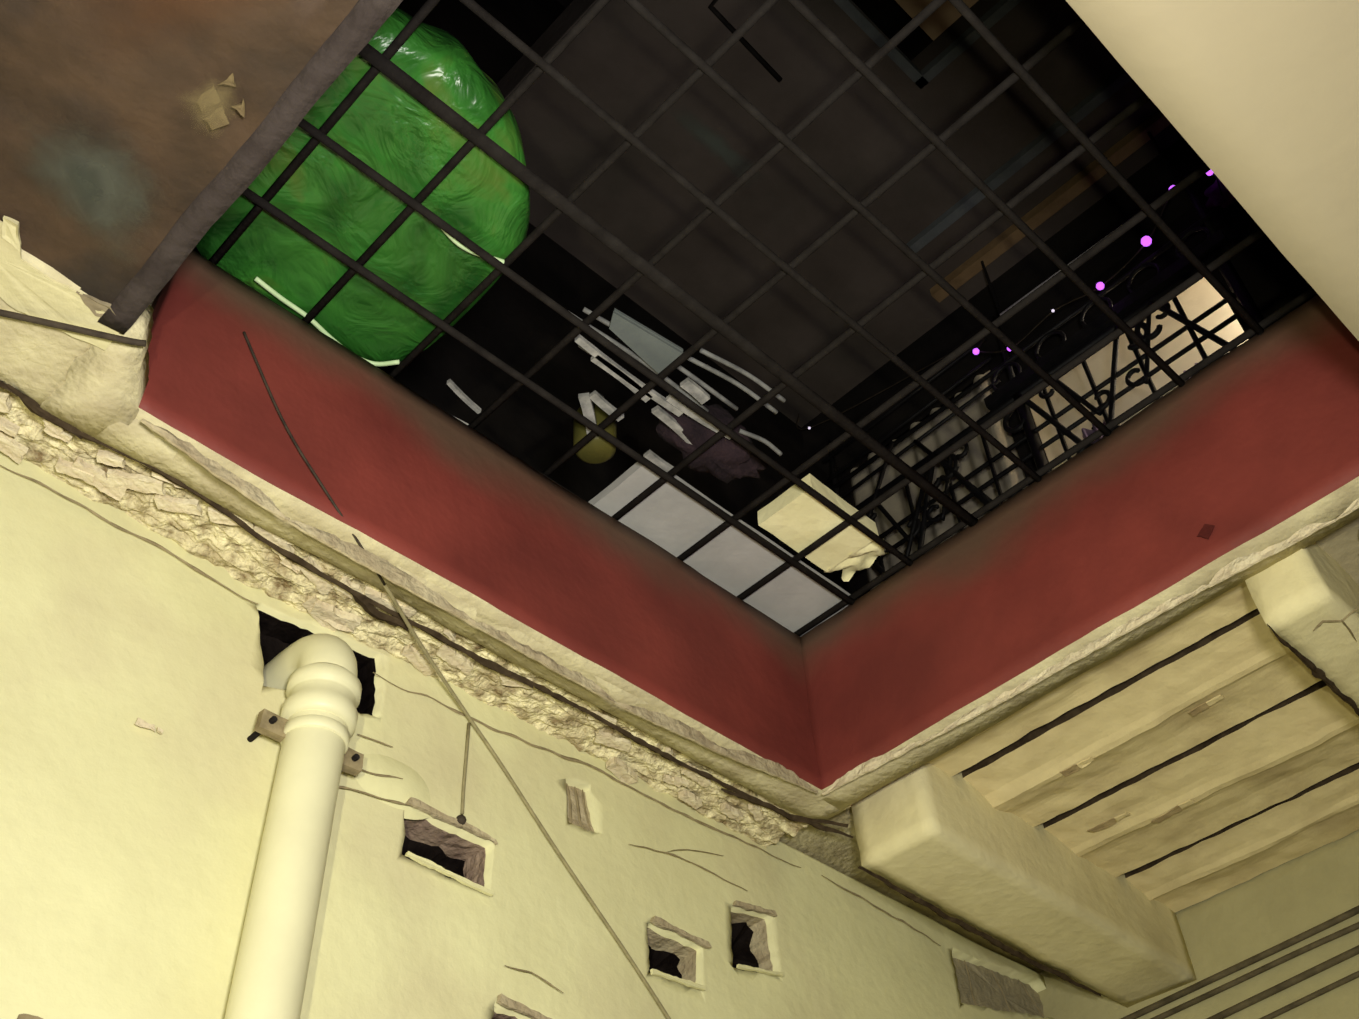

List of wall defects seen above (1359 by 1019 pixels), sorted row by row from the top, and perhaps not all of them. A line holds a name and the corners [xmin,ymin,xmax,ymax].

spalling [0,387,1359,848]
spalling [402,797,498,897]
spalling [647,916,712,991]
spalling [731,900,784,977]
spalling [492,993,552,1019]